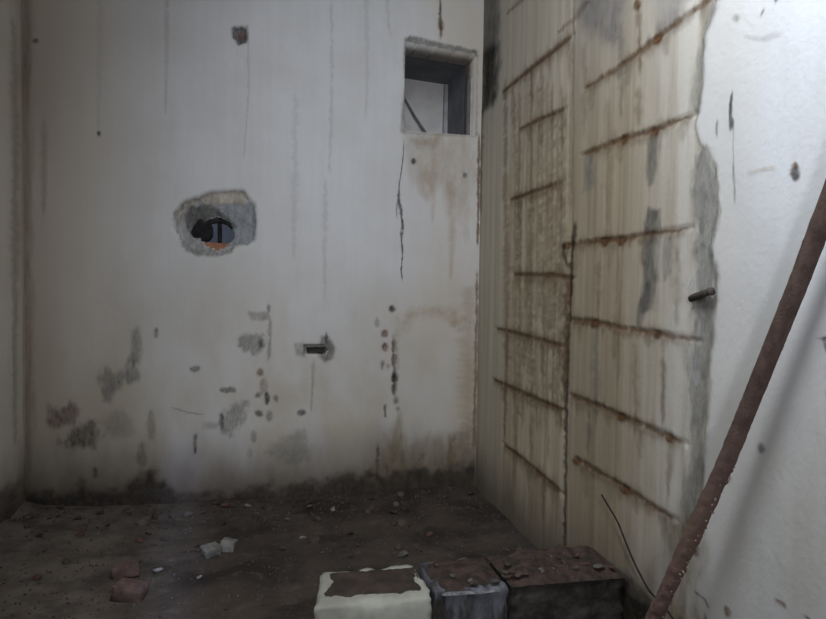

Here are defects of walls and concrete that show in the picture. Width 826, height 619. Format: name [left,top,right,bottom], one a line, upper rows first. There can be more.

corrosion [503,39,569,92]
corrosion [586,116,687,153]
spalling [174,191,256,255]
crack [396,145,404,278]
corrosion [590,229,682,246]
corrosion [574,396,674,442]
leakage [26,471,183,506]
leakage [235,466,475,499]